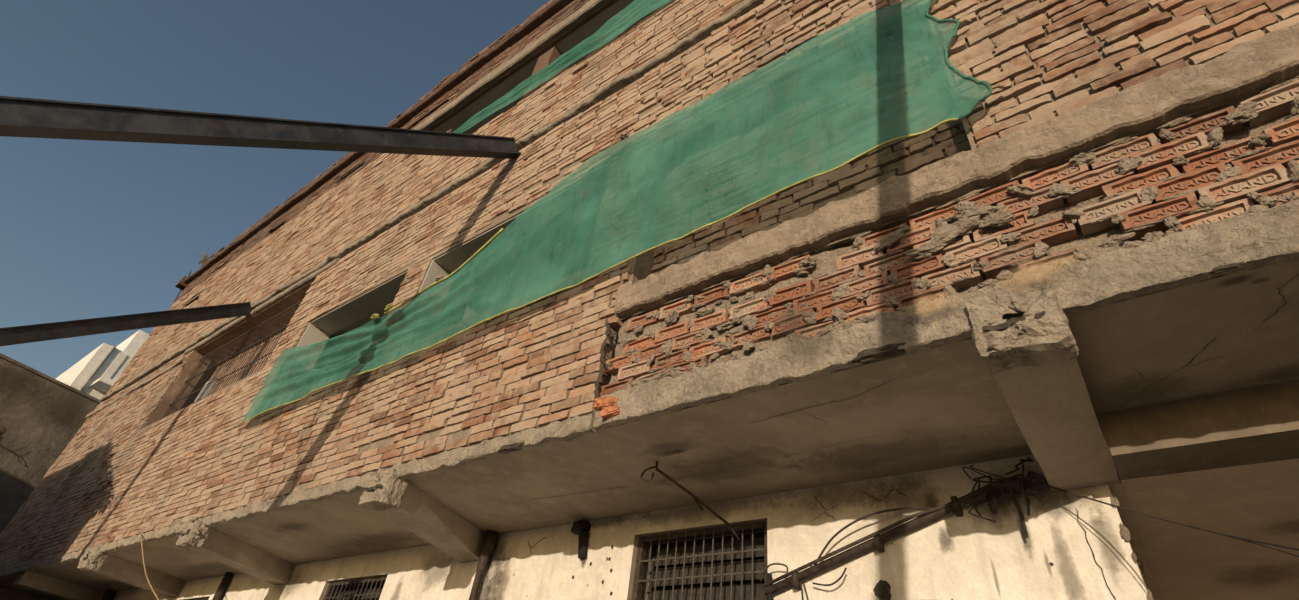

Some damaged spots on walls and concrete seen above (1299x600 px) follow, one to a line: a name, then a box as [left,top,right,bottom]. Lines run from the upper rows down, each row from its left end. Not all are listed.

spalling [593,78,1299,419]
spalling [359,468,411,512]
spalling [176,516,212,552]
spalling [77,546,110,572]